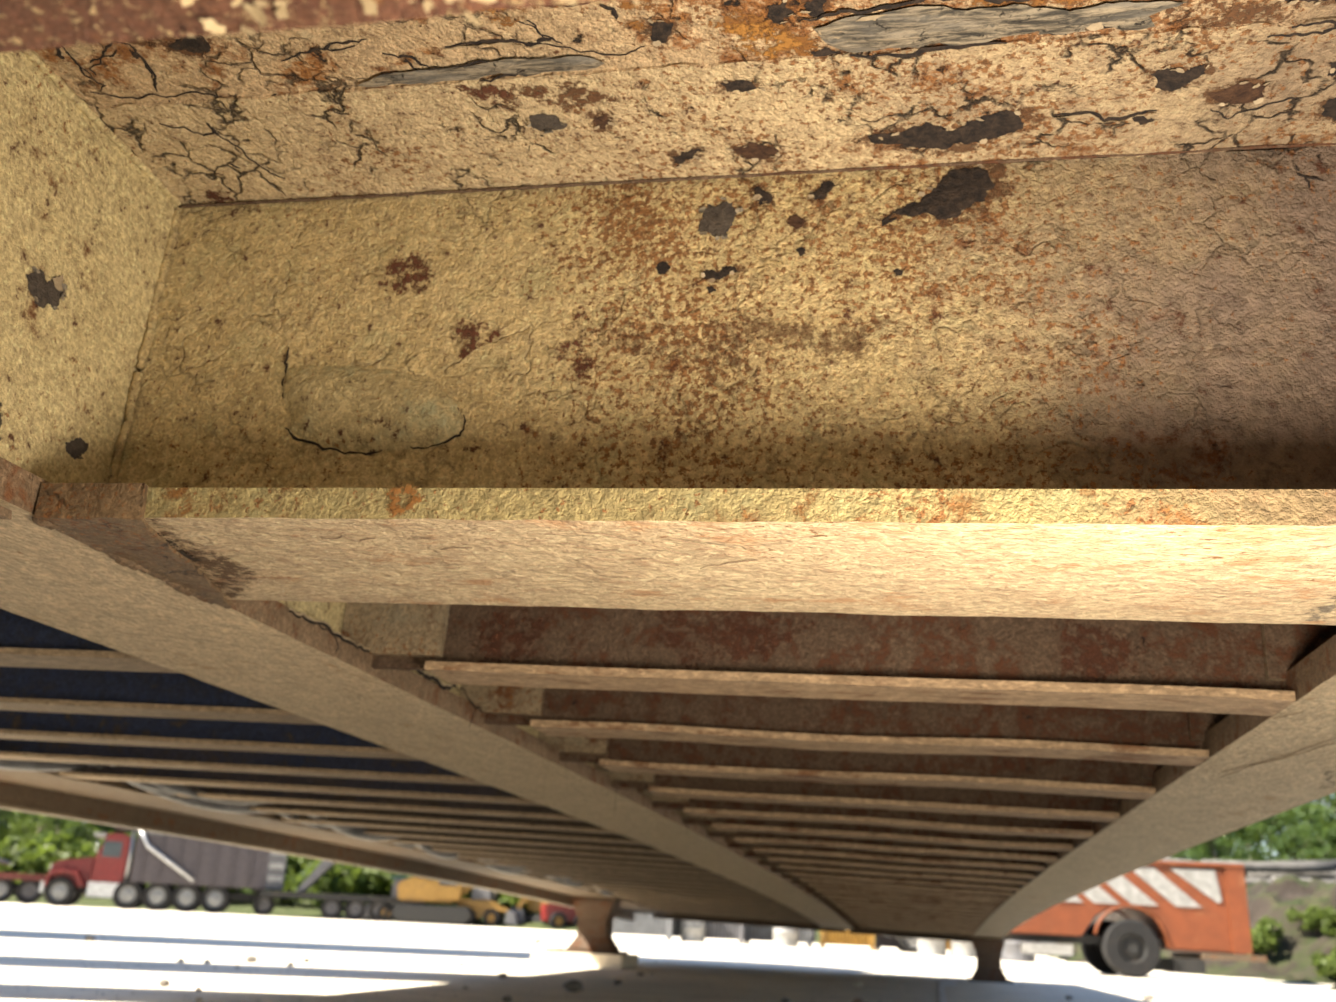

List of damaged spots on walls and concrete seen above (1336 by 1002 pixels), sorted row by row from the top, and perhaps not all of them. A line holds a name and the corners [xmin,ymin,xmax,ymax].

corrosion [128,35,212,61]
peeling [186,0,289,37]
peeling [408,0,497,26]
crack [281,3,645,70]
corrosion [619,0,649,32]
corrosion [708,9,819,60]
crack [1267,20,1336,38]
crack [56,42,285,179]
crack [1055,110,1157,125]
spalling [846,106,1044,228]
spalling [26,266,67,310]
corrosion [379,252,434,295]